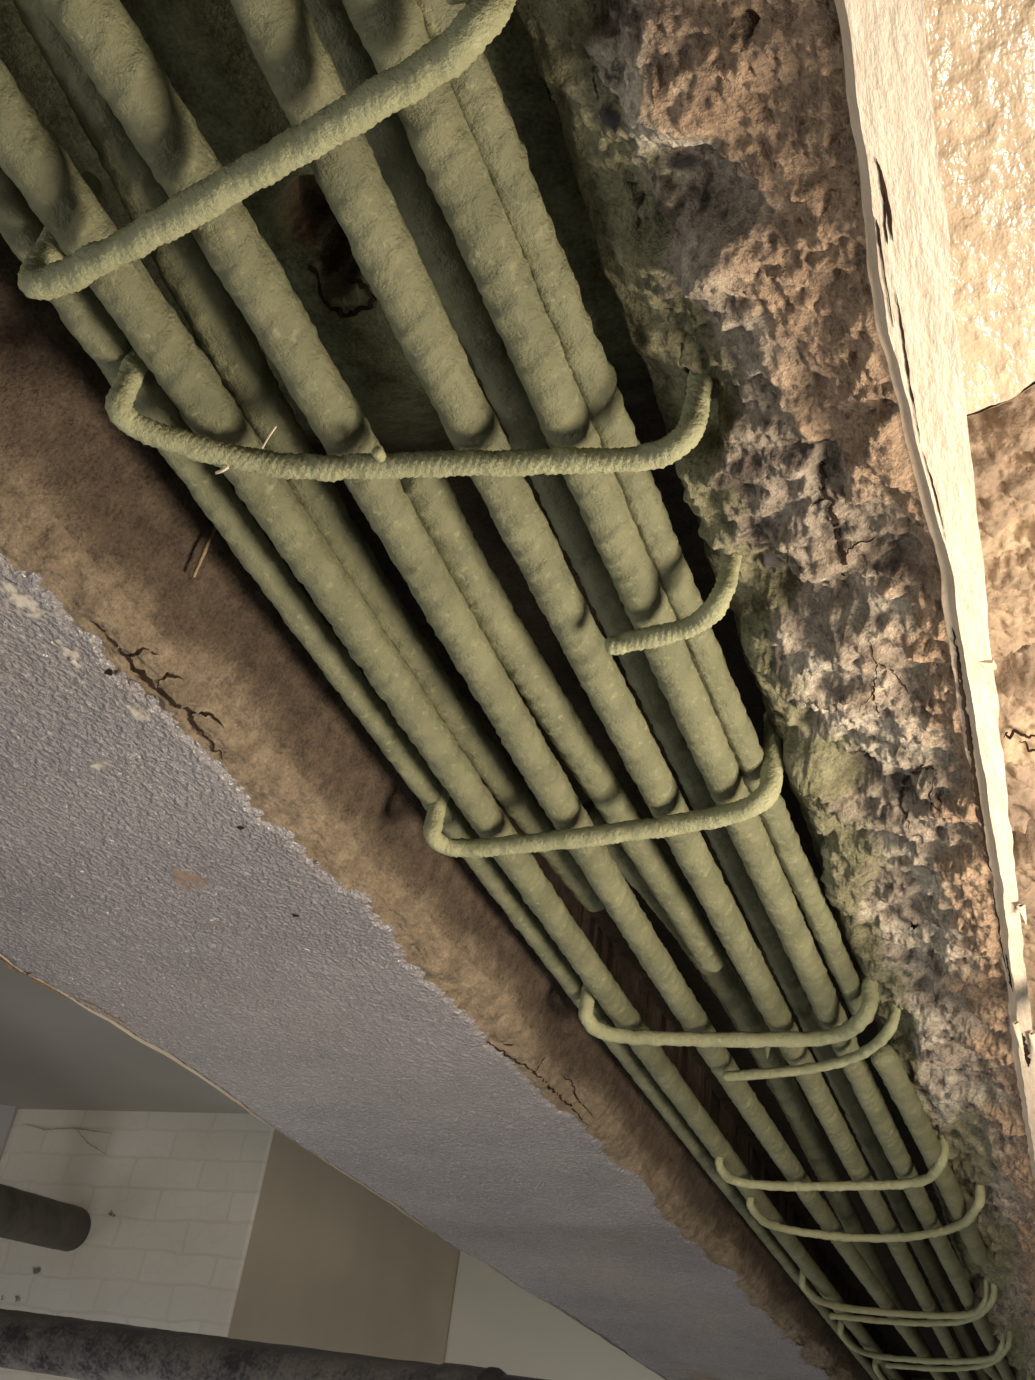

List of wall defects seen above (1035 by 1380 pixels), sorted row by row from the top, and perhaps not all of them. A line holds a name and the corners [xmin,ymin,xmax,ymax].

spalling [0,0,131,230]
spalling [120,0,292,166]
spalling [242,164,455,453]
crack [876,159,946,537]
crack [811,448,875,587]
crack [92,621,224,760]
spalling [483,0,1035,1380]
crack [859,633,909,718]
spalling [0,234,935,1380]
crack [899,628,1035,992]
crack [1022,1033,1031,1067]